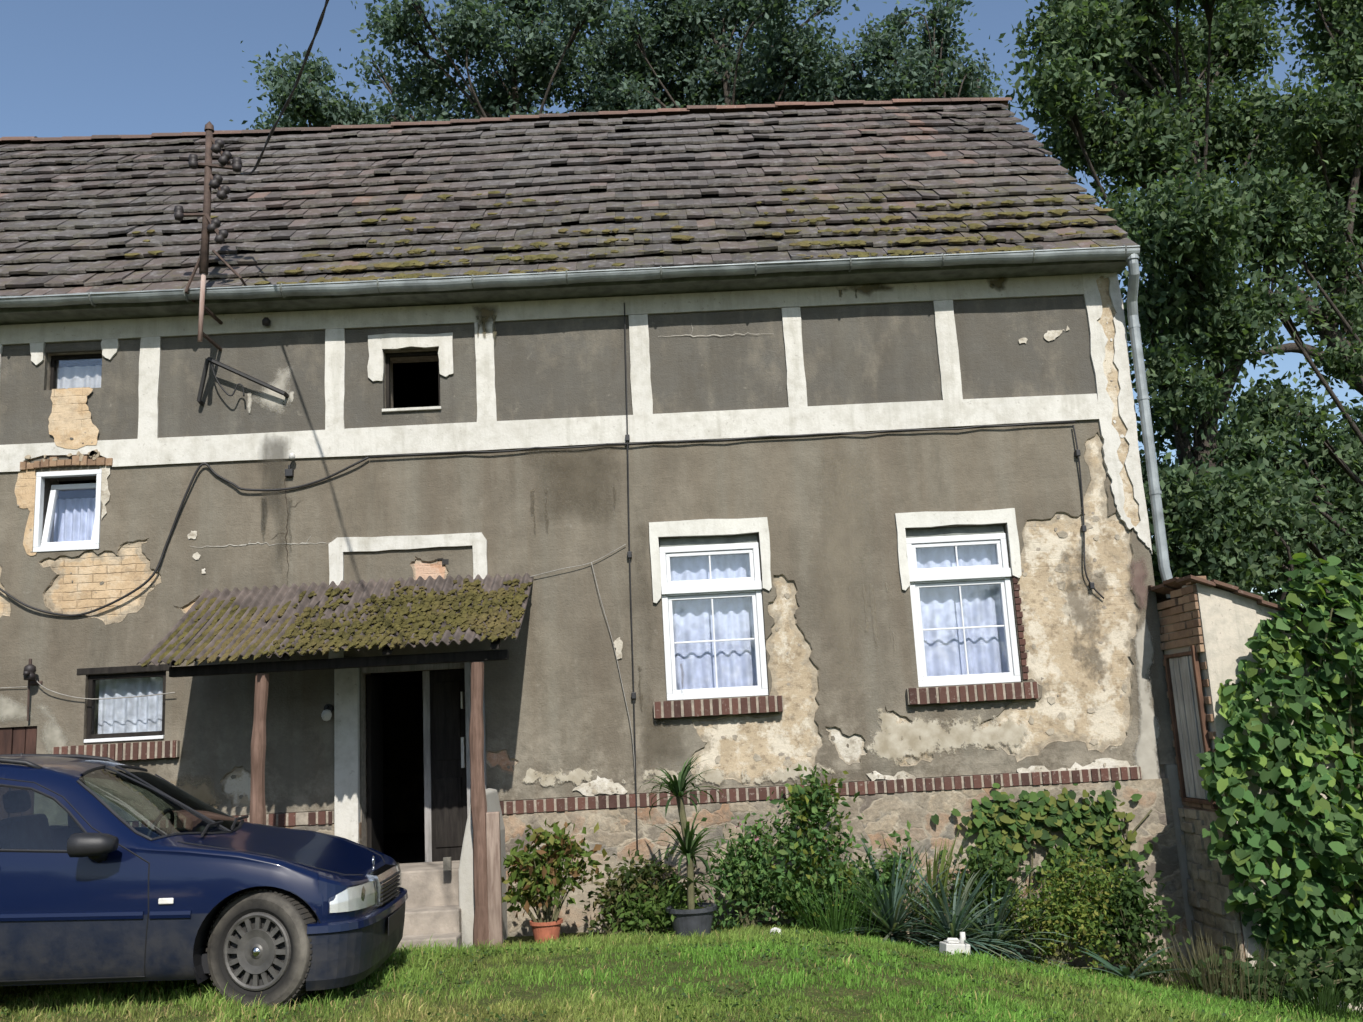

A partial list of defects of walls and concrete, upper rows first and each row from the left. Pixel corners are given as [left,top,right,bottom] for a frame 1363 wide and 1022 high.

peeling [15,387,162,625]
peeling [979,276,1142,773]
peeling [0,565,11,617]
spalling [410,556,449,580]
peeling [690,574,938,786]
peeling [220,765,251,809]
peeling [486,749,519,775]
peeling [572,775,628,796]